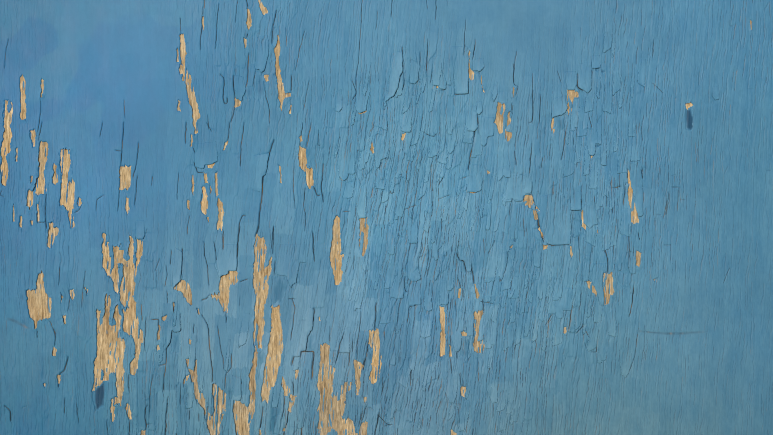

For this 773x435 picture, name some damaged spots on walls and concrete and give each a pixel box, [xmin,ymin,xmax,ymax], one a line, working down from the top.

peeling [0,75,82,248]
peeling [176,31,202,148]
crack [207,56,270,165]
crack [272,10,308,107]
crack [511,52,541,123]
peeling [27,268,88,332]
peeling [92,233,145,435]
crack [129,317,242,435]
crack [203,142,275,300]
peeling [183,234,384,435]
peeling [328,216,344,285]
crack [291,299,385,377]